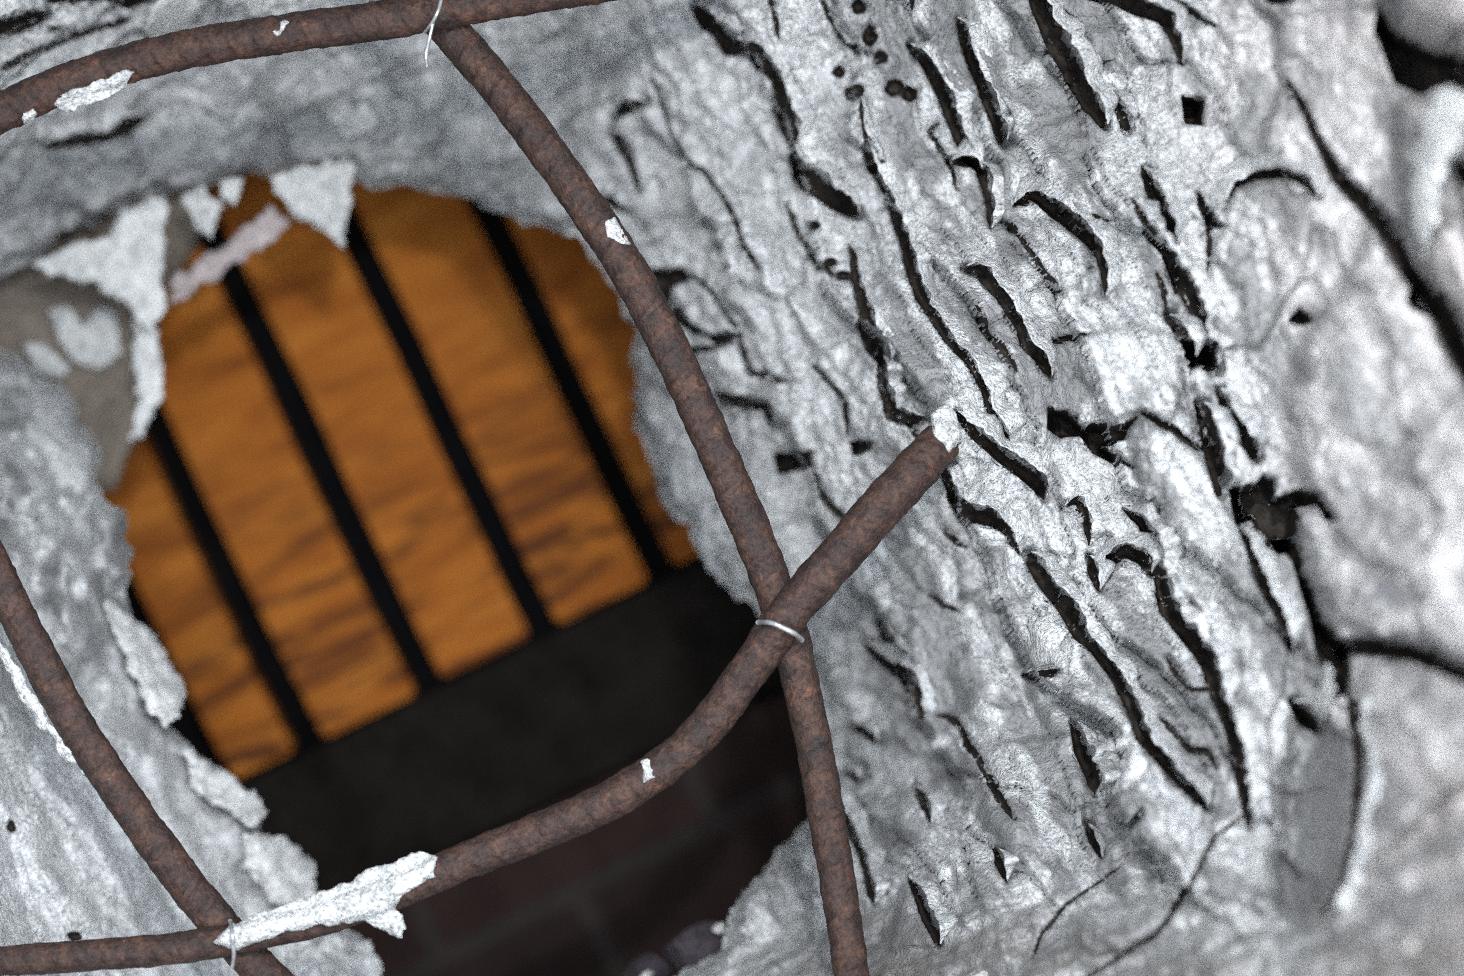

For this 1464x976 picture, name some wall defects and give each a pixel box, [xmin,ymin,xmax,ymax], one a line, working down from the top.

spalling [0,0,962,976]
crack [602,71,759,270]
crack [670,0,1464,976]